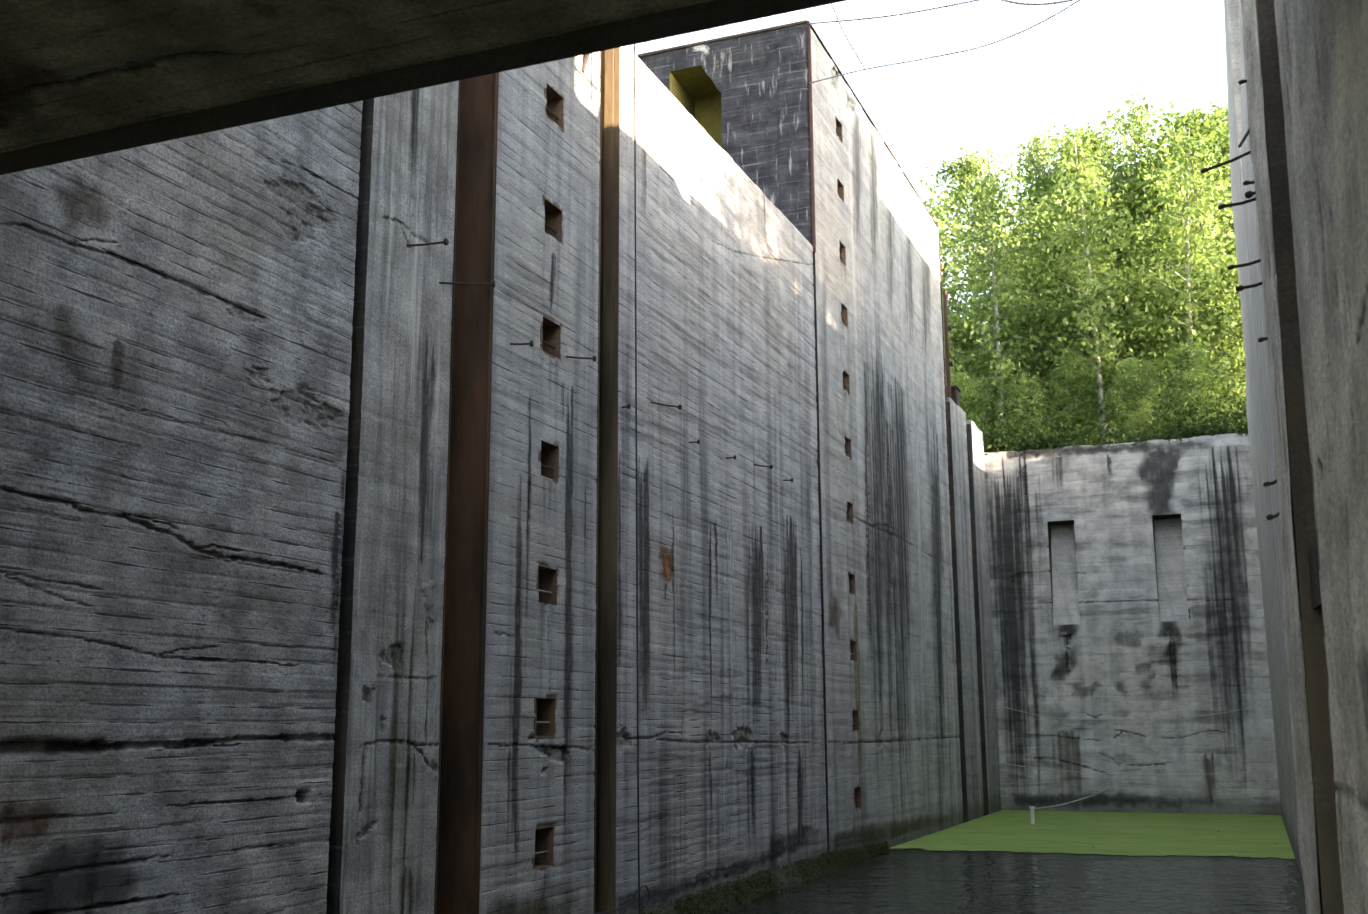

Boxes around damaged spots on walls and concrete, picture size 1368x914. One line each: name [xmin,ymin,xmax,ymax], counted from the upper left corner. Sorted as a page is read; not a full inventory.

crack [0,221,244,310]
crack [0,570,105,608]
crack [0,484,325,577]
damp [637,458,650,702]
corrosion [661,548,673,598]
damp [987,443,1193,808]
crack [366,674,437,768]
crack [1023,714,1225,770]
damp [16,839,131,914]